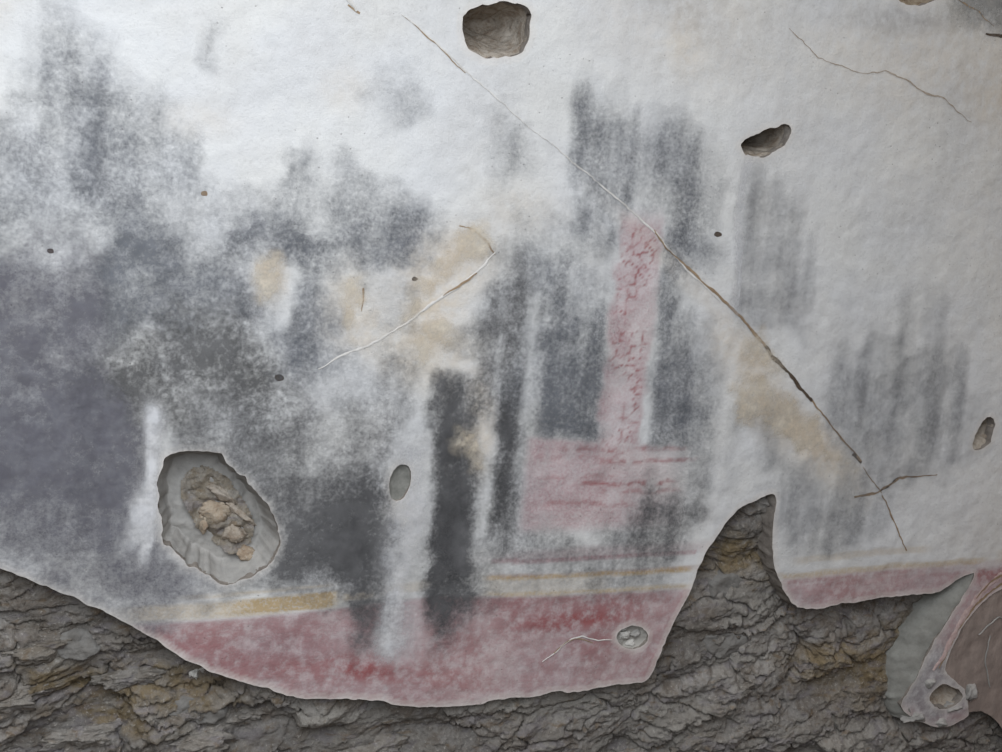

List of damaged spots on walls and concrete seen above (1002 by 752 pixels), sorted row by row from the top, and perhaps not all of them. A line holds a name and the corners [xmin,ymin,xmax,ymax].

crack [347,0,360,14]
leakage [70,84,143,195]
crack [789,28,971,122]
crack [401,14,937,551]
spalling [157,451,280,583]
leakage [0,194,478,658]
spalling [389,464,410,500]
leakage [493,381,522,551]
leakage [532,262,603,440]
leakage [613,503,706,567]
leakage [653,340,708,445]
spalling [0,495,1002,752]